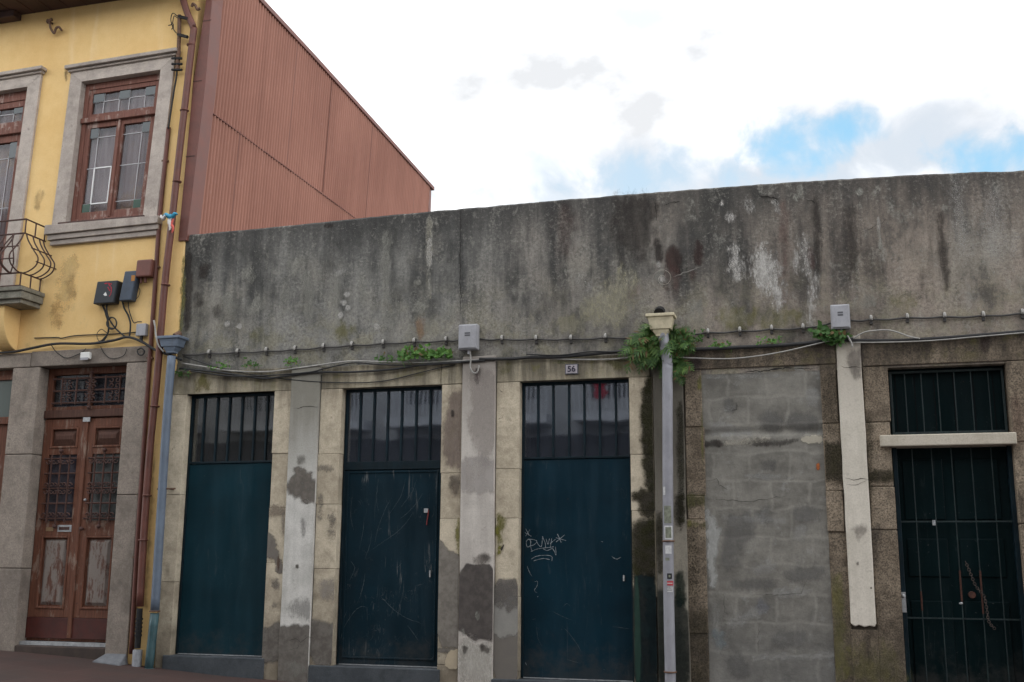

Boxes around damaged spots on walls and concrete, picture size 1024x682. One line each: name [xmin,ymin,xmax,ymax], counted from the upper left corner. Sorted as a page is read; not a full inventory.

damp [610,196,703,285]
damp [813,204,821,295]
damp [937,213,949,286]
damp [640,374,654,491]
peeling [286,466,336,536]
peeling [437,539,518,682]